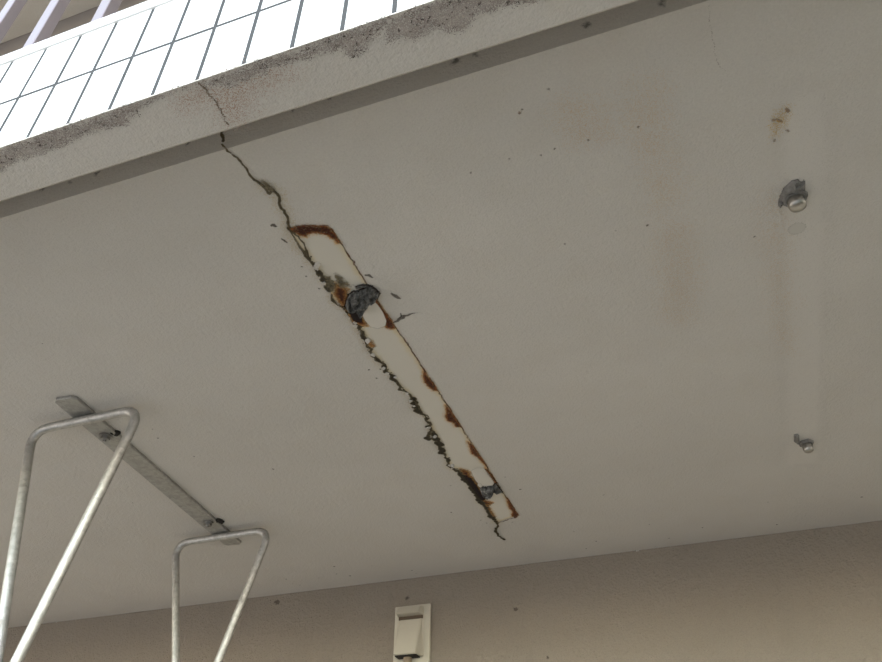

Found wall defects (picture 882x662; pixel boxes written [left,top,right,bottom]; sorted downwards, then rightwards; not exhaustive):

corrosion [290,224,365,282]
crack [157,49,506,540]
corrosion [331,280,369,328]
peeling [282,225,512,523]
corrosion [376,299,498,483]
corrosion [458,467,518,518]